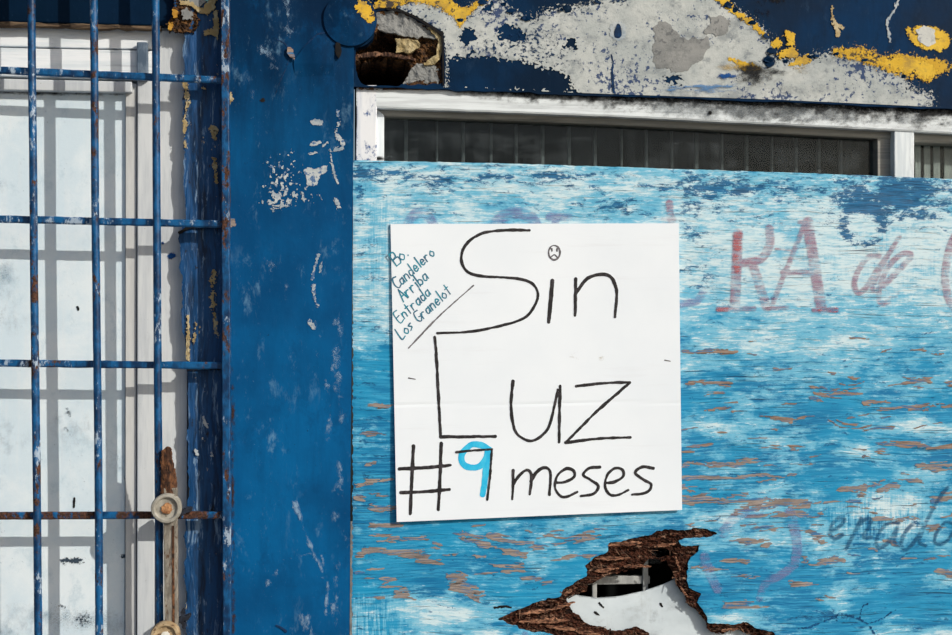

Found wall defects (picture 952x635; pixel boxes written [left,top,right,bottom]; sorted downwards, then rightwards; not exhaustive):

spalling [165,0,220,40]
peeling [354,0,952,107]
peeling [262,109,345,212]
peeling [186,315,197,362]
peeling [681,341,758,356]
peeling [685,379,743,413]
peeling [809,372,952,431]
peeling [681,416,952,548]
peeling [353,478,606,603]
peeling [691,558,760,579]
peeling [801,539,897,574]
peeling [721,599,770,609]